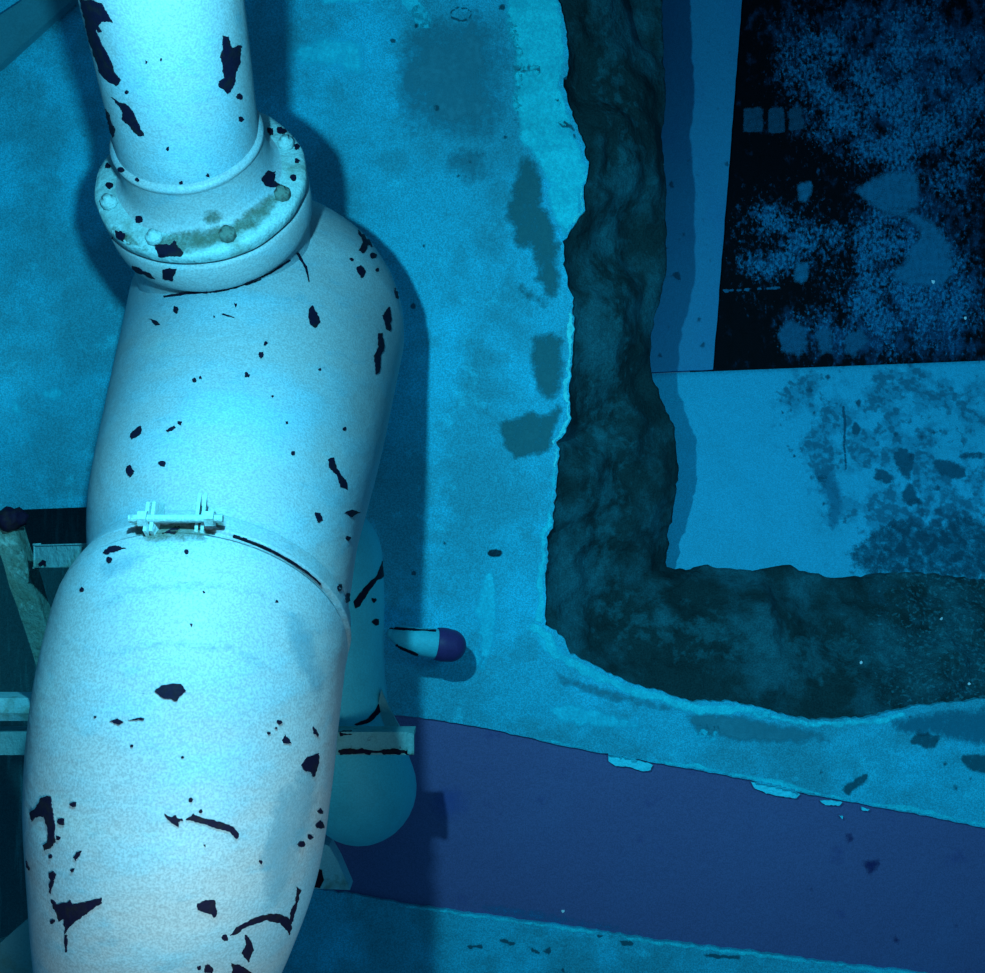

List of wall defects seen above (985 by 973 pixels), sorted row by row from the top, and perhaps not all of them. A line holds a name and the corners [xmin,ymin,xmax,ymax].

water stain [403,16,499,133]
water stain [507,159,561,295]
water stain [502,408,561,457]
water stain [532,334,562,398]
spalling [551,313,575,499]
water stain [875,448,922,506]
water stain [934,452,984,478]
spalling [530,511,905,727]